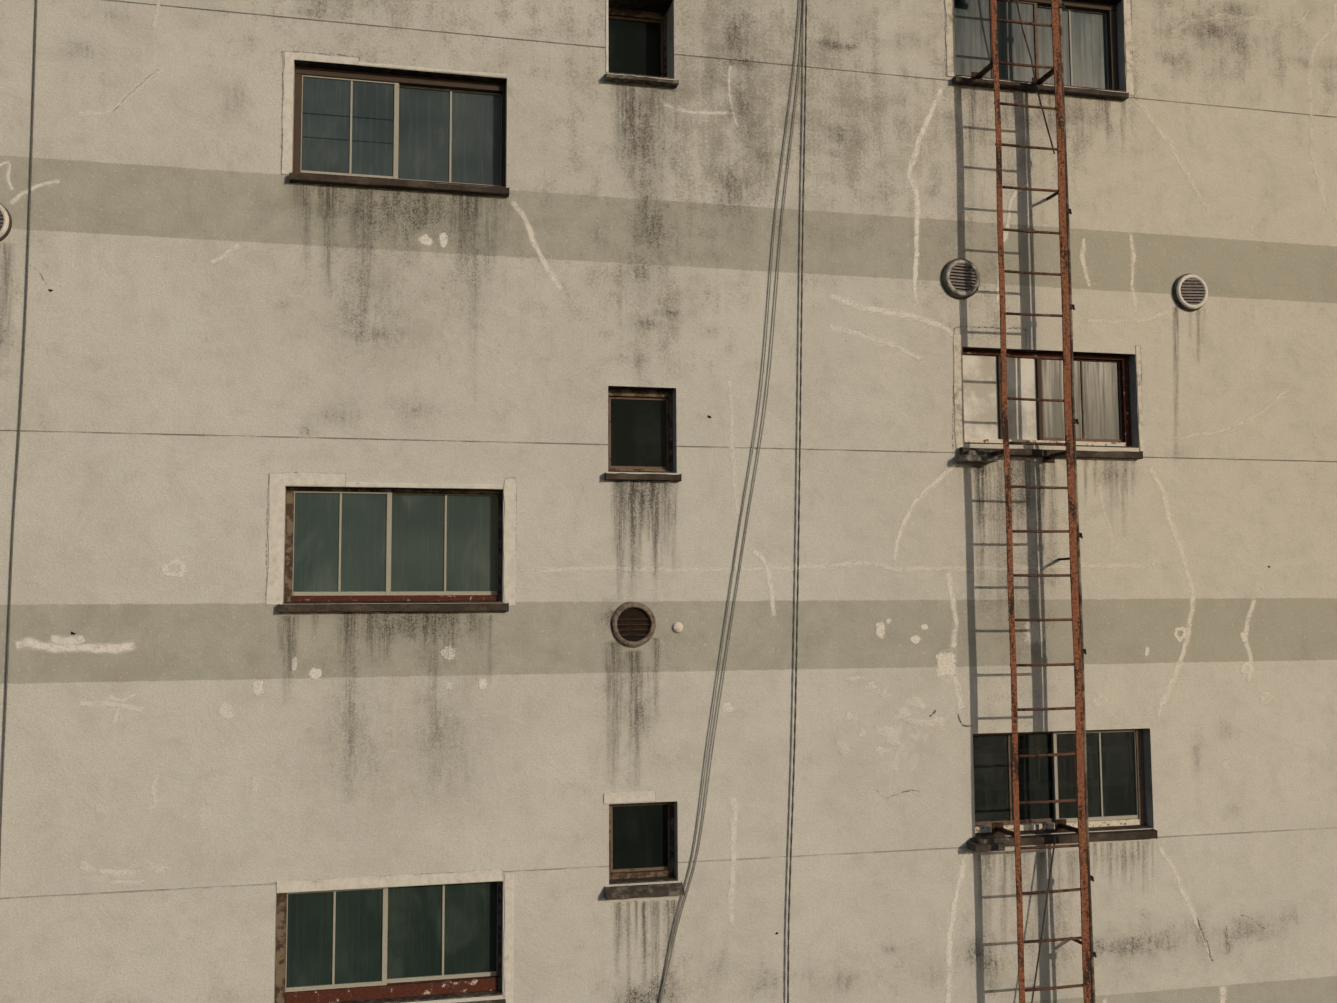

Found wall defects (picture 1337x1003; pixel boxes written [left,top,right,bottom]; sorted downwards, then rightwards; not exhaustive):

crack [1159,846,1265,1003]